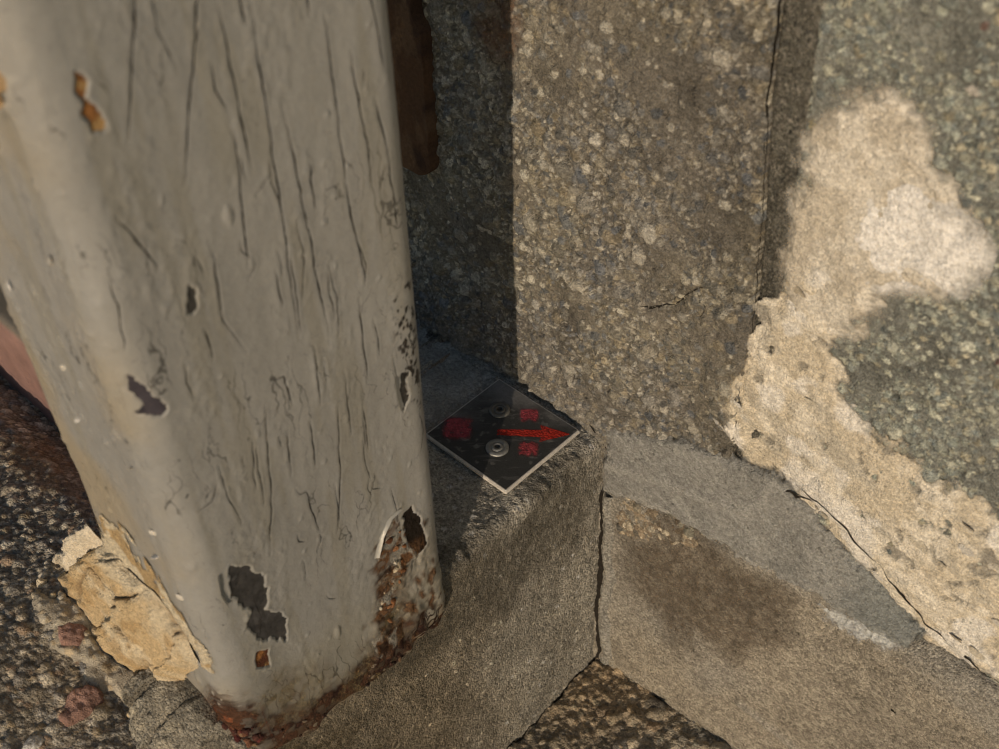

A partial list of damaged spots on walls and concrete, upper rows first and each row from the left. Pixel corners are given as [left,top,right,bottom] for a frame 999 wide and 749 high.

rust [74,72,107,132]
crack [752,0,782,332]
water stain [780,86,997,341]
spalling [31,589,136,727]
peeling [127,374,167,416]
peeling [228,565,287,641]
rust [208,519,443,749]
crack [506,425,616,749]
crack [759,450,946,641]
flaking render [714,268,999,681]